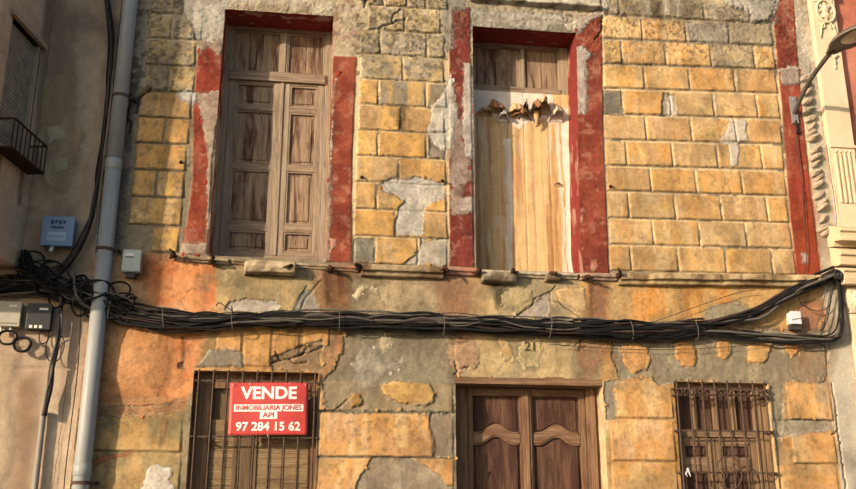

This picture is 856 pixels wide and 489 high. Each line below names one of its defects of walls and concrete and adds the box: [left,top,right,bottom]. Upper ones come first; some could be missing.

flaking render [182,0,335,55]
flaking render [379,63,475,267]
flaking render [224,297,280,313]
flaking render [294,286,320,312]
flaking render [500,285,587,319]
crack [272,347,322,364]
flaking render [271,329,480,460]
flaking render [607,298,831,465]
flaking render [141,464,174,489]
flaking render [356,456,454,489]